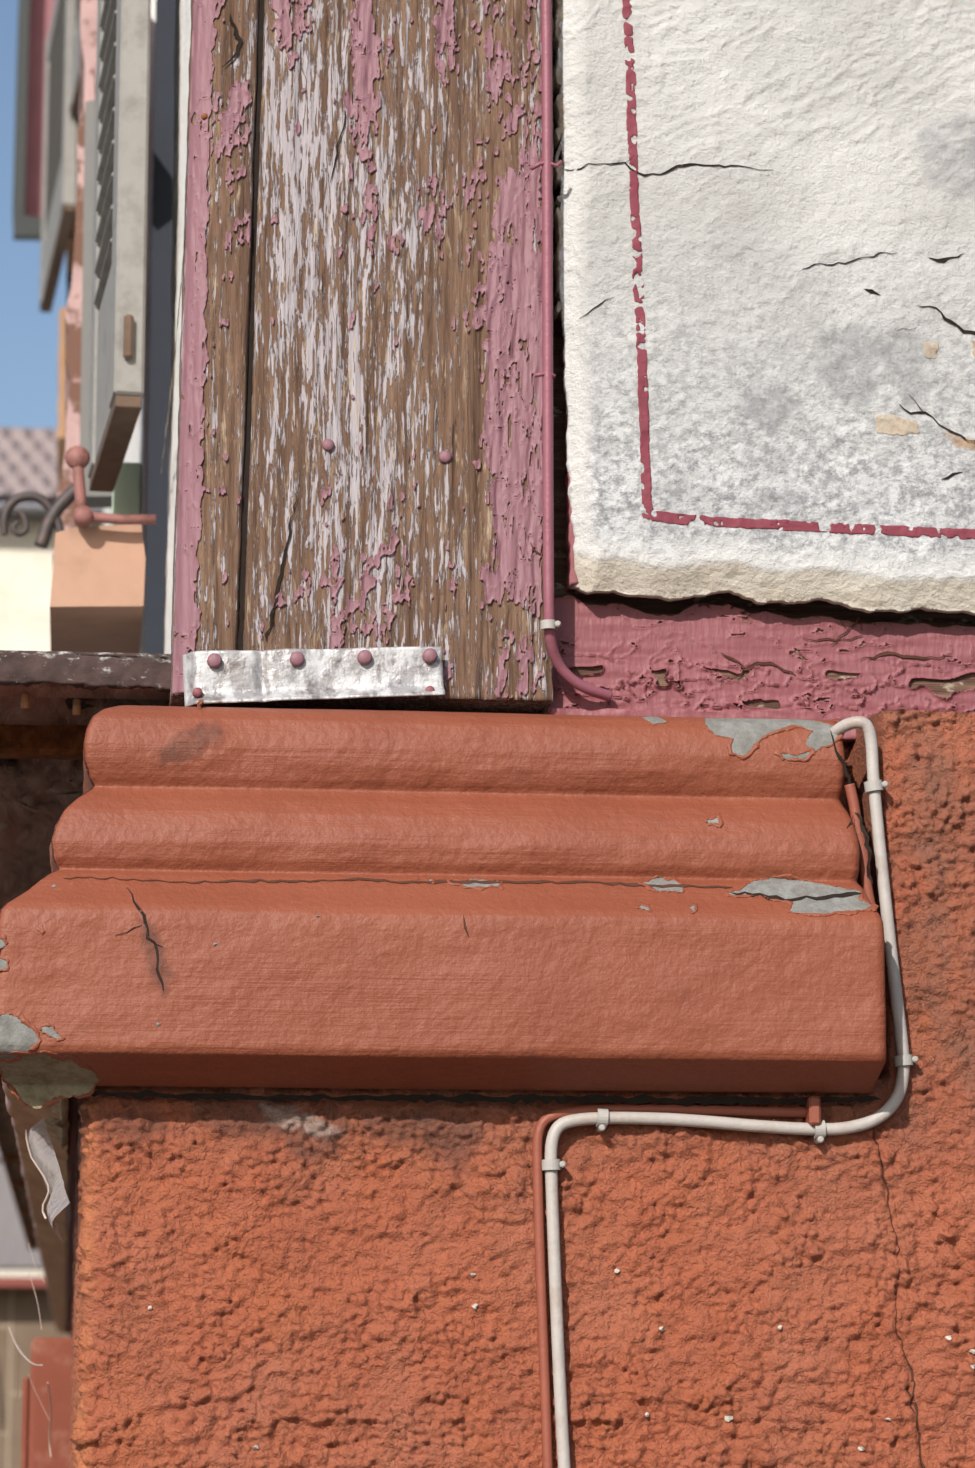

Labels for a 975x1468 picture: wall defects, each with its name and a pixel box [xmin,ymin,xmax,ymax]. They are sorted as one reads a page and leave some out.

peeling [333,0,413,256]
crack [564,158,759,177]
peeling [172,0,252,694]
peeling [417,0,975,762]
crack [804,252,963,295]
crack [899,306,975,335]
crack [899,397,975,479]
peeling [260,480,420,650]
crack [66,730,873,989]
peeling [724,874,879,917]
peeling [0,1011,103,1149]
crack [91,1090,925,1468]